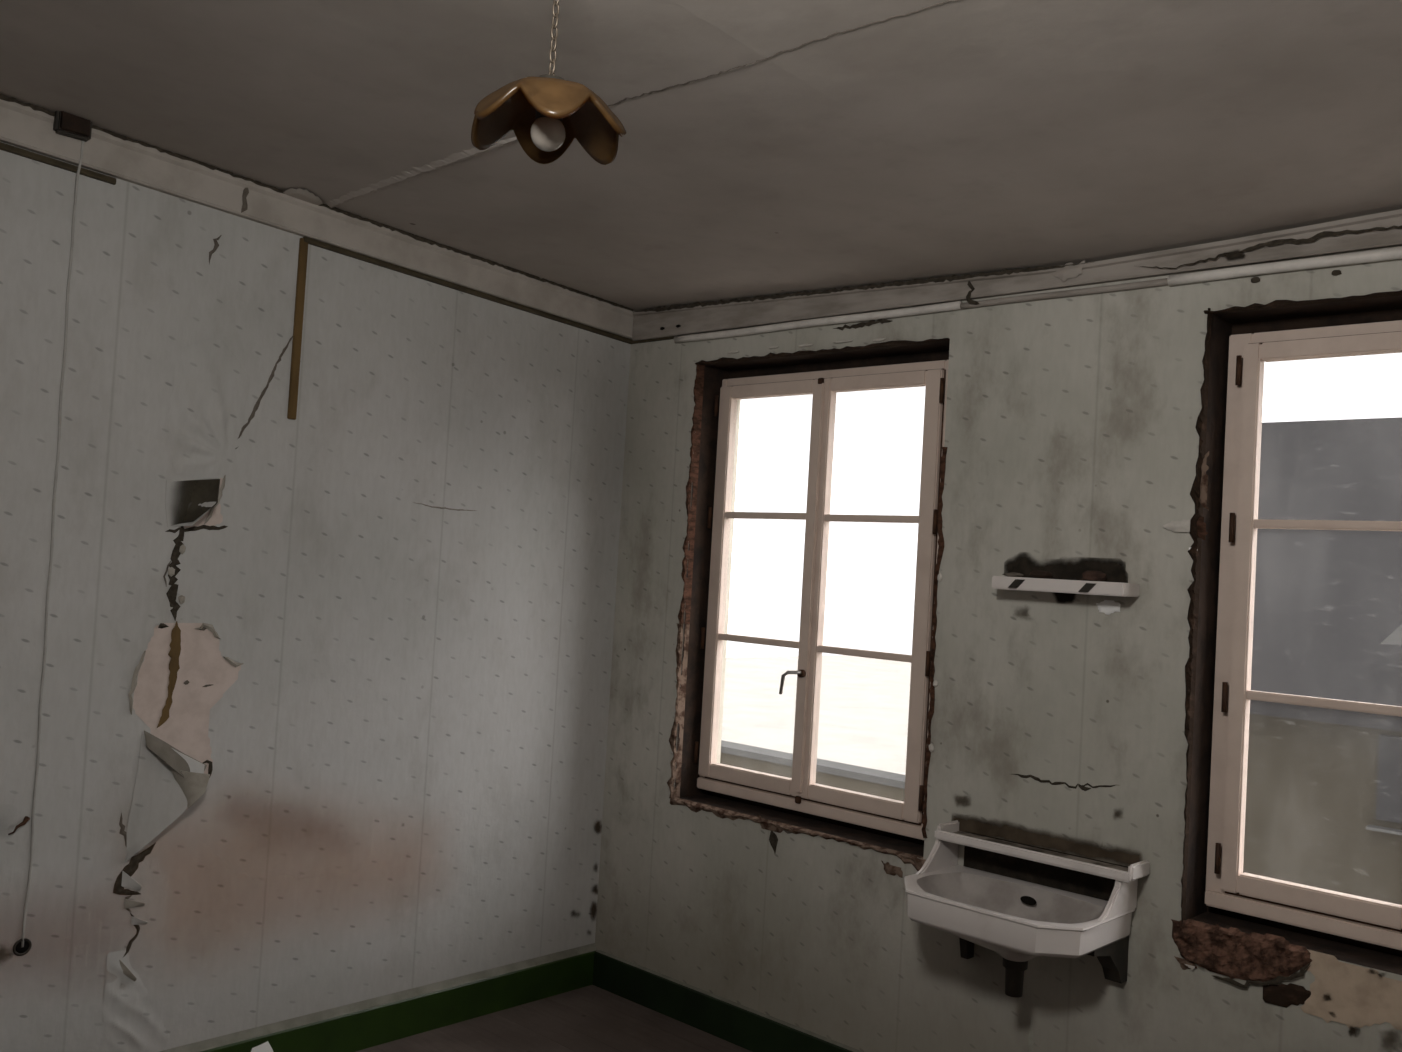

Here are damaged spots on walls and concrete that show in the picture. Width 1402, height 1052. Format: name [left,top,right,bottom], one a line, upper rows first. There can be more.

crack [0,93,55,116]
crack [92,125,285,213]
crack [318,203,1092,330]
crack [1140,225,1402,269]
crack [235,336,293,449]
crack [163,525,228,621]
spalling [667,338,949,878]
spalling [1004,553,1128,603]
spalling [1096,600,1120,615]
spalling [1171,290,1402,1036]
peeling [124,621,243,863]
crack [1013,774,1115,791]